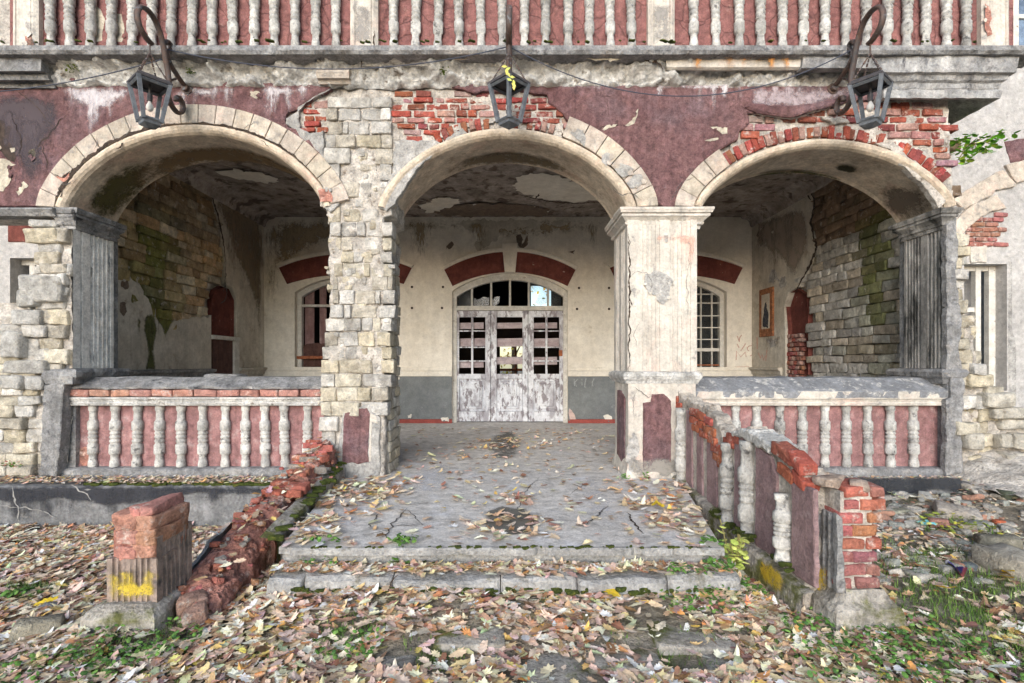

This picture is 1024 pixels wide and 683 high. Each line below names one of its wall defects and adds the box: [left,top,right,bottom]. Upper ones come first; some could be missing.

flaking render [301,100,329,133]
flaking render [391,90,586,146]
flaking render [740,102,959,168]
flaking render [0,120,35,196]
peeling [216,168,281,184]
peeling [418,173,597,218]
crack [796,193,817,291]
flaking render [965,212,1009,247]
peeling [644,270,673,305]
crack [365,509,423,538]